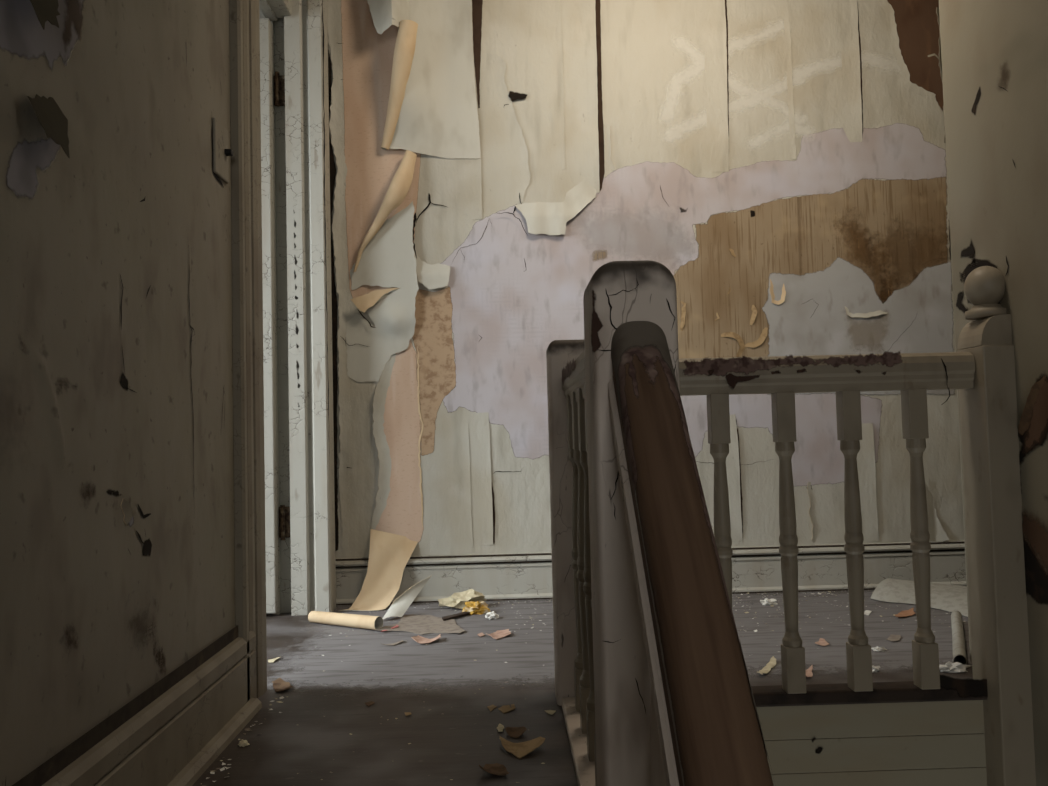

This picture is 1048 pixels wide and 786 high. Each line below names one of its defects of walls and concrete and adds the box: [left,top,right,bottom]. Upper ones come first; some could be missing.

peeling [0,0,84,70]
peeling [6,94,70,199]
crack [455,53,531,258]
crack [604,123,615,171]
peeling [412,0,947,527]
water stain [674,177,948,359]
peeling [683,220,997,377]
flaking render [1018,375,1048,465]
spalling [107,490,152,556]
peeling [308,529,431,630]
flaking render [1022,512,1048,604]